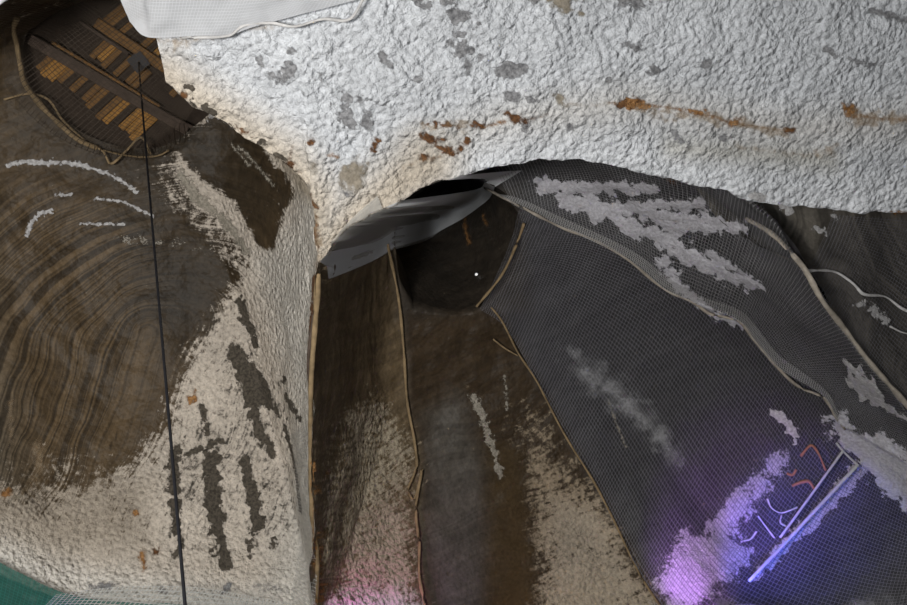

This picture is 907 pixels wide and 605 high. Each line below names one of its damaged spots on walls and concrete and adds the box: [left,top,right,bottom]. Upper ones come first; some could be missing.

rust [616,97,651,110]
rust [419,111,534,156]